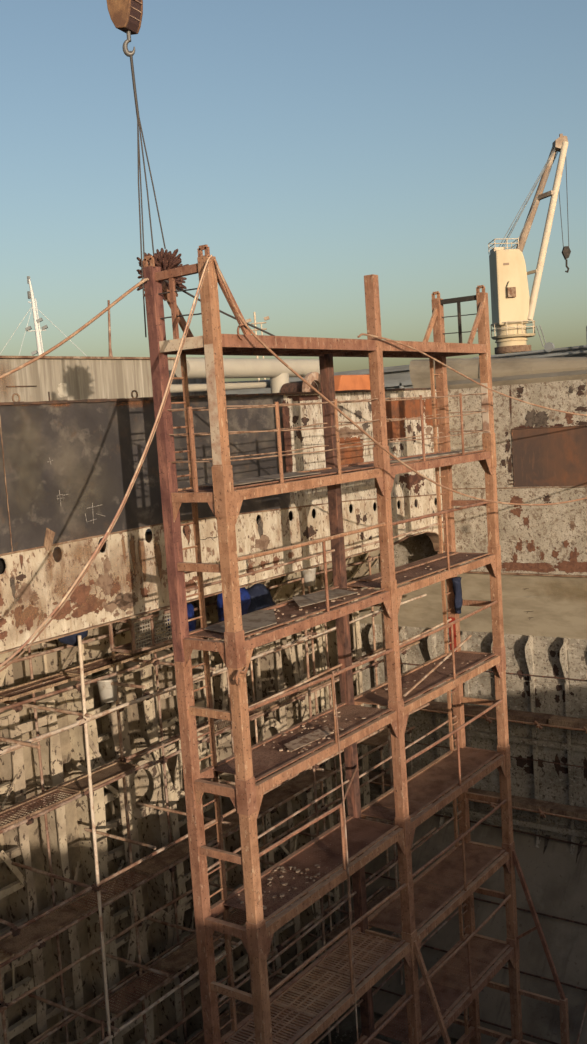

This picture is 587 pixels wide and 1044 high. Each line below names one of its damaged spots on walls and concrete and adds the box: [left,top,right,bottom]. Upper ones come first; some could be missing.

peeling [282,400,309,473]
peeling [391,422,439,453]
peeling [500,385,587,478]
peeling [399,474,425,495]
peeling [303,525,318,540]
peeling [356,512,372,540]
peeling [510,496,579,565]
peeling [247,534,293,576]
peeling [0,555,149,641]